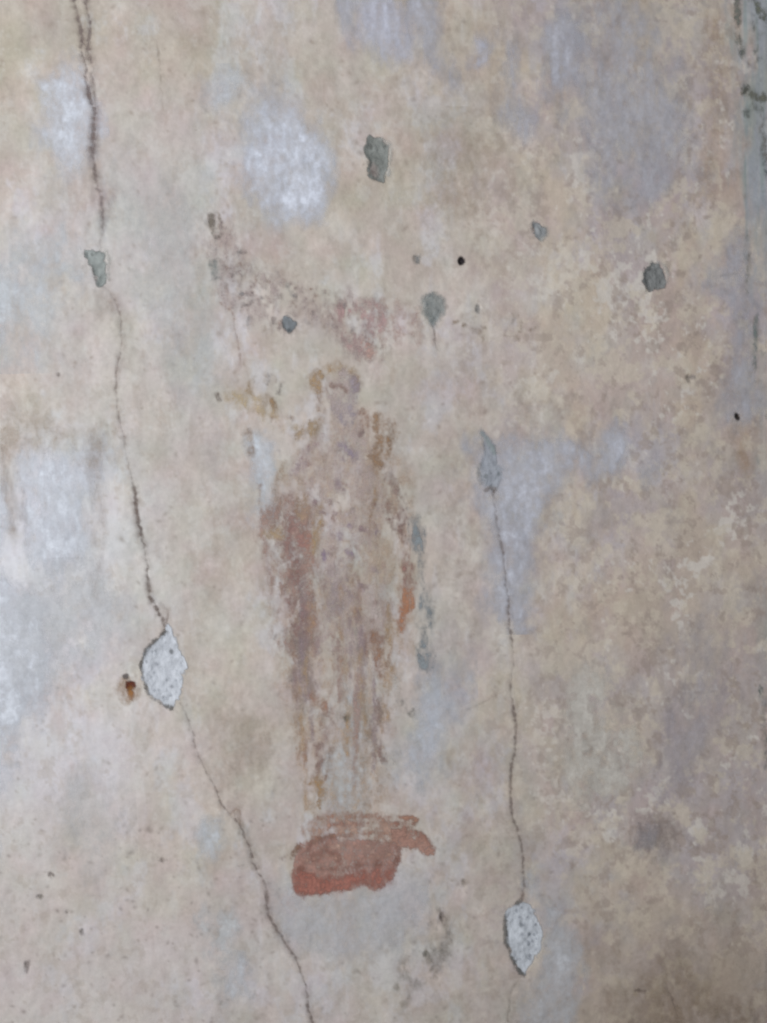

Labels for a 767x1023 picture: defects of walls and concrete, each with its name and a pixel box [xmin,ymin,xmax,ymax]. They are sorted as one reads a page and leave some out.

crack [73,0,91,60]
crack [86,86,97,176]
spalling [364,135,390,183]
spalling [642,262,666,292]
crack [133,488,142,536]
crack [147,568,164,621]
corrosion [120,674,136,698]
spalling [503,919,525,976]